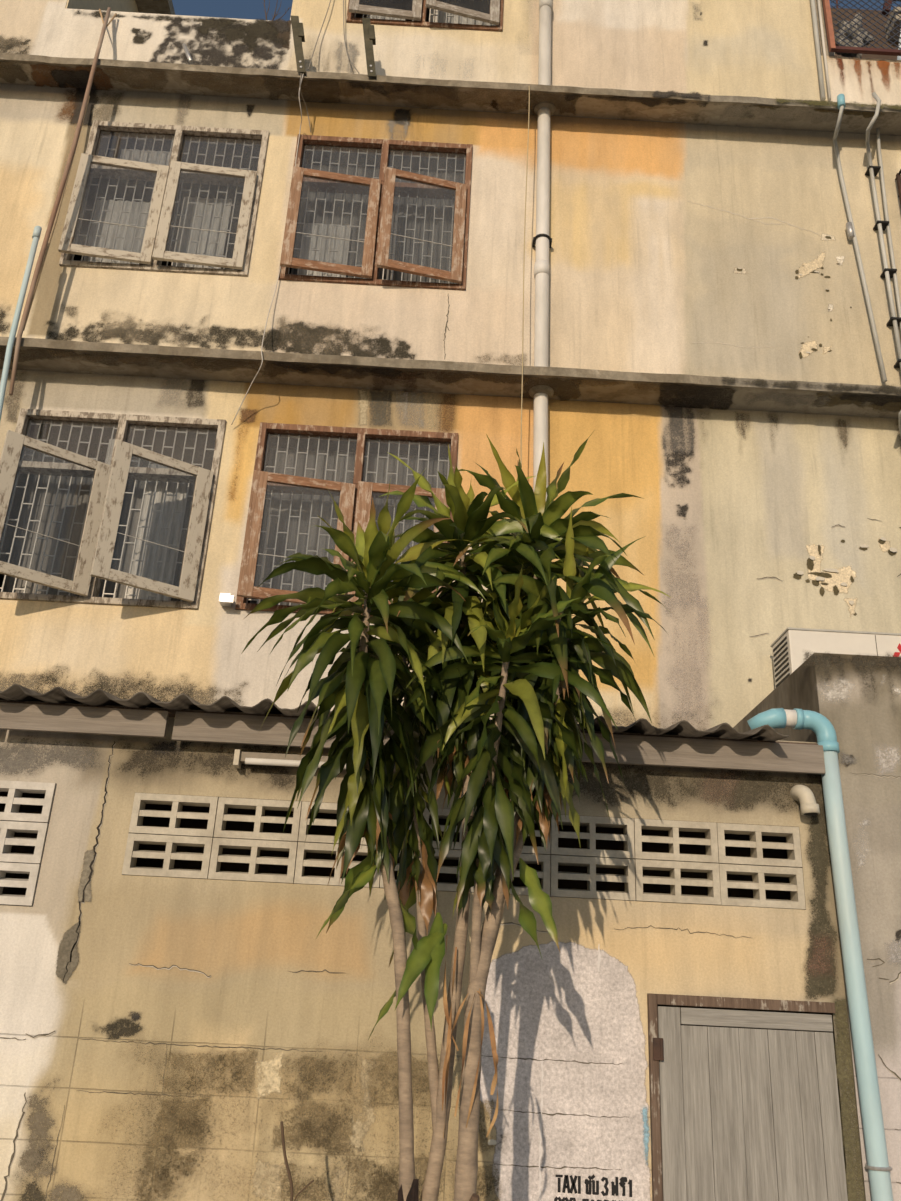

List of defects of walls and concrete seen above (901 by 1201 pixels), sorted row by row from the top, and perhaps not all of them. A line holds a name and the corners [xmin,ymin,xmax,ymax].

leakage [0,11,711,140]
corrosion [836,58,900,90]
peeling [795,233,845,321]
peeling [799,341,832,359]
leakage [0,305,901,487]
peeling [793,545,857,616]
crack [56,741,116,984]
crack [129,963,211,978]
crack [617,925,749,938]
crack [867,934,901,984]
leakage [18,1088,87,1201]
leakage [93,1012,440,1201]